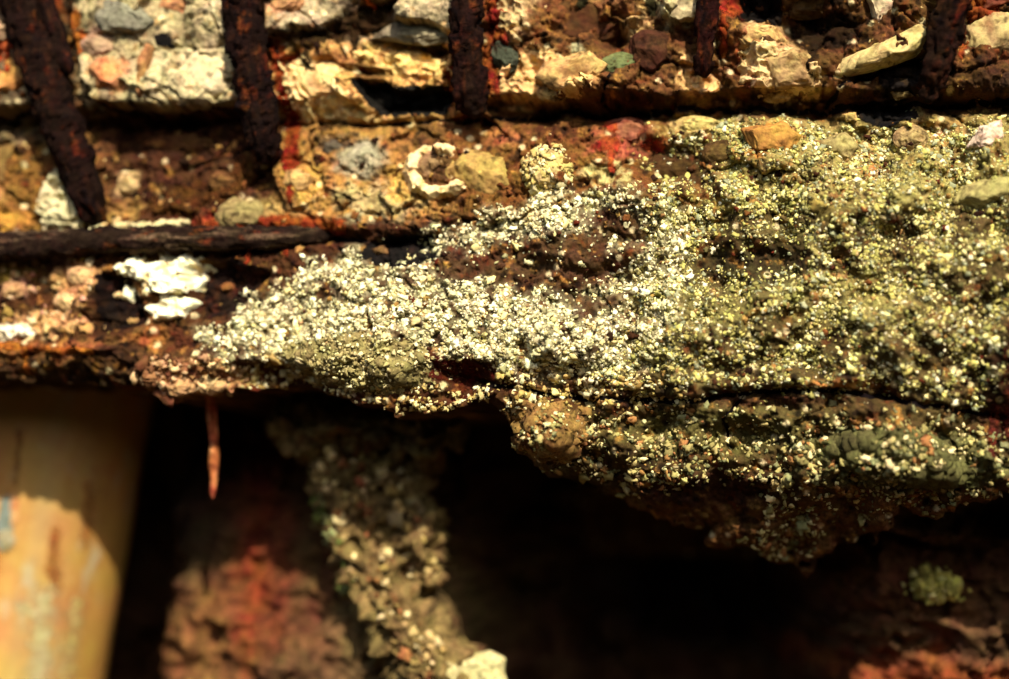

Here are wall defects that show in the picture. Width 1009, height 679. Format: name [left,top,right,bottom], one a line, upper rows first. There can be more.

corrosion [55,0,87,65]
corrosion [482,0,509,99]
corrosion [718,0,746,59]
spalling [351,78,464,123]
water stain [34,169,191,231]
corrosion [236,185,346,236]
spalling [402,143,467,200]
spalling [360,234,438,268]
spalling [94,273,146,330]
water stain [112,251,218,321]
spalling [203,257,270,319]
corrosion [0,342,95,375]